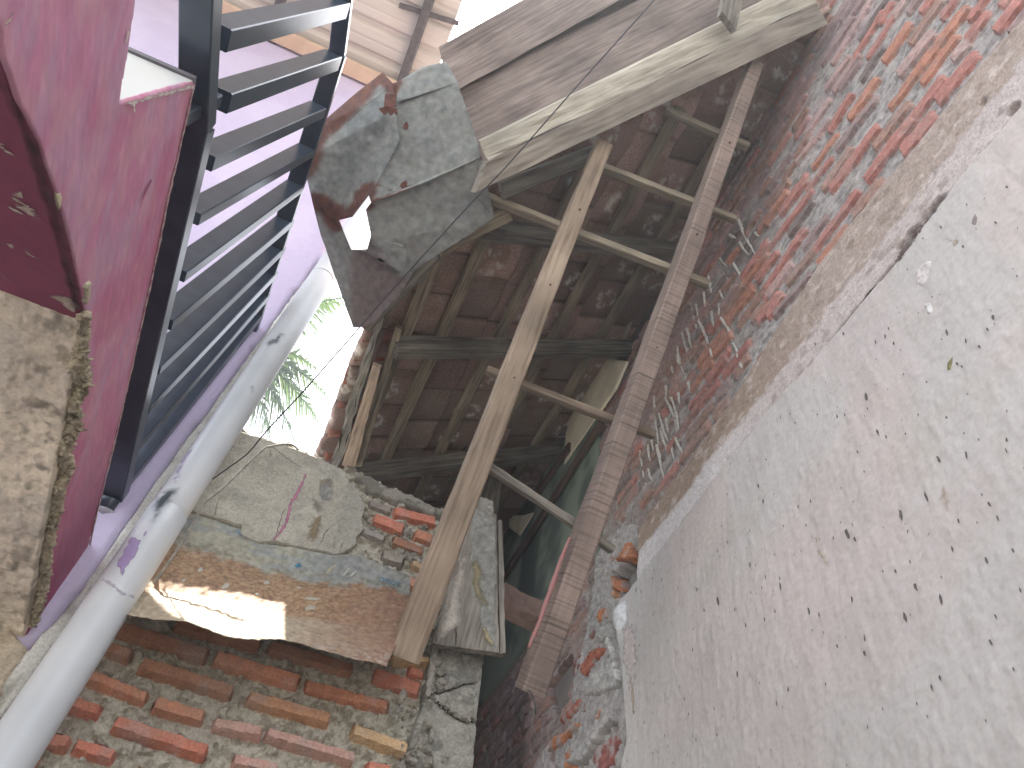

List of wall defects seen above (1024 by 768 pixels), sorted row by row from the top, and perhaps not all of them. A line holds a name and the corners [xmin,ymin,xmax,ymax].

corrosion [379,106,409,130]
spalling [534,523,639,768]
crack [434,683,474,723]